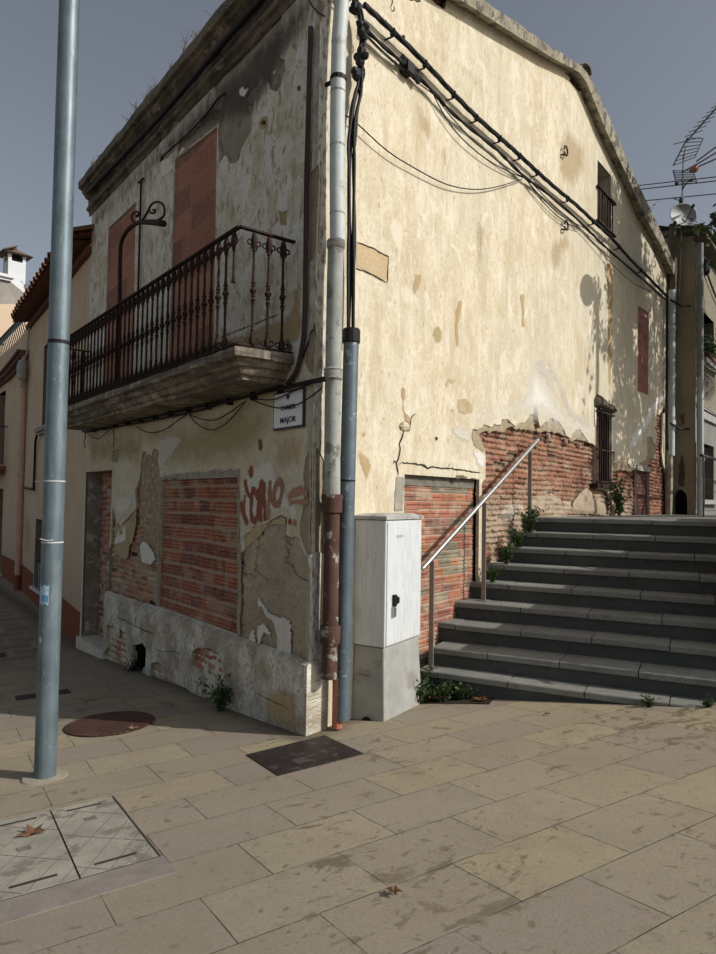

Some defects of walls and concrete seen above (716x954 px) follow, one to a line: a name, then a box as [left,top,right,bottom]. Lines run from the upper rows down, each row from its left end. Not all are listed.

flaking render [176,15,286,164]
flaking render [105,449,164,606]
flaking render [240,447,324,660]
crack [393,387,480,475]
flaking render [455,410,665,577]
spalling [106,625,177,685]
flaking render [194,648,222,692]